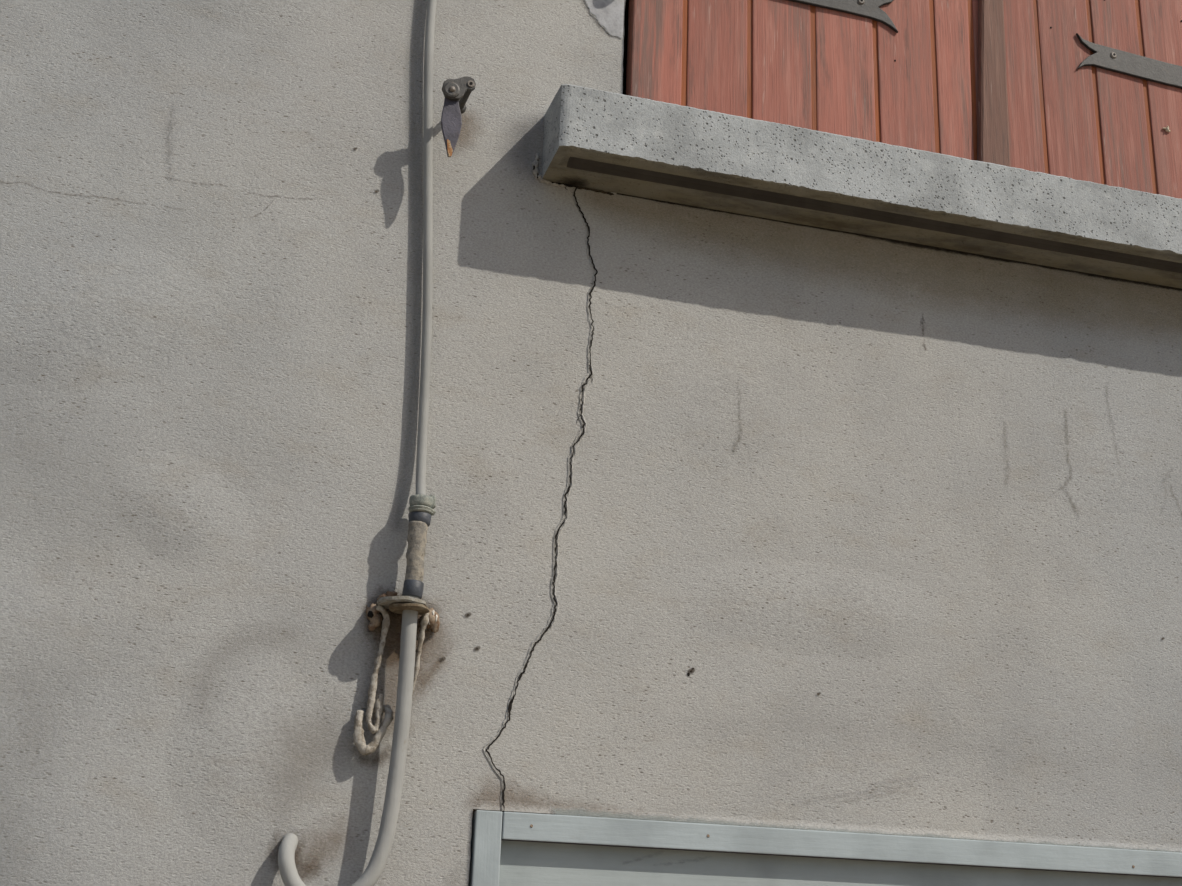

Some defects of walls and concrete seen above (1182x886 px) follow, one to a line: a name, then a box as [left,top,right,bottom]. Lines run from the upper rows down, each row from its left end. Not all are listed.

peeling [584,0,624,38]
crack [482,179,614,811]